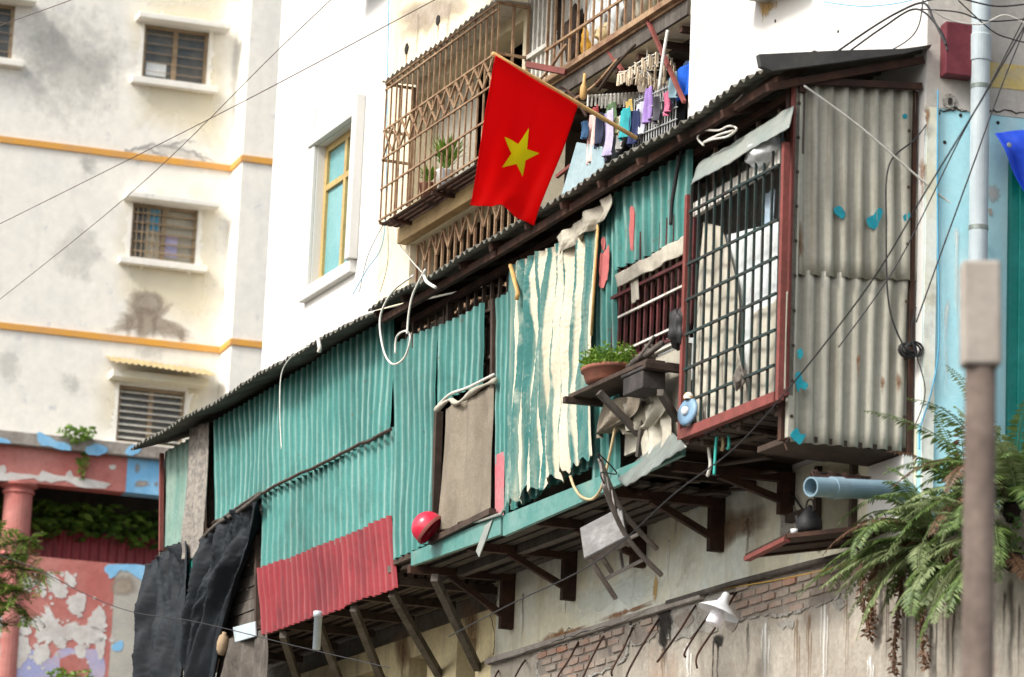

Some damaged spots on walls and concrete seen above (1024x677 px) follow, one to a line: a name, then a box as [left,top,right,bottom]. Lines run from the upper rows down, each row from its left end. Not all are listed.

crack [124,139,214,162]
leakage [119,294,184,338]
peeling [0,465,111,489]
peeling [104,564,145,581]
peeling [16,571,123,677]
leakage [658,610,673,665]
spalling [534,557,870,677]
leakage [712,635,723,677]
leakage [746,622,770,668]
leakage [794,604,828,677]
leakage [902,583,955,660]
leakage [1003,583,1020,643]